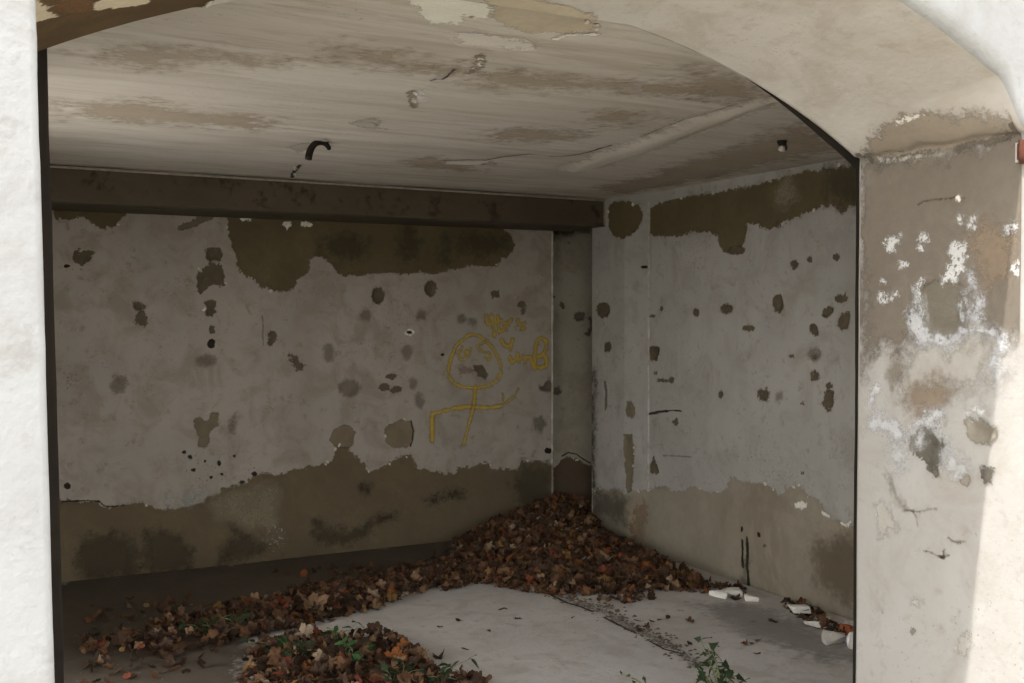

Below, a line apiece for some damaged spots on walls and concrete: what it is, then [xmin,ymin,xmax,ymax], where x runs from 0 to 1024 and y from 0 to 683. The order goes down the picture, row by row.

flaking render [35,0,214,52]
flaking render [408,0,602,40]
flaking render [196,218,515,348]
flaking render [607,109,1022,376]
leakage [882,233,909,270]
flaking render [908,427,946,478]
leakage [866,240,1008,490]
flaking render [964,406,997,446]
leakage [62,483,456,683]
flaking render [60,418,854,620]